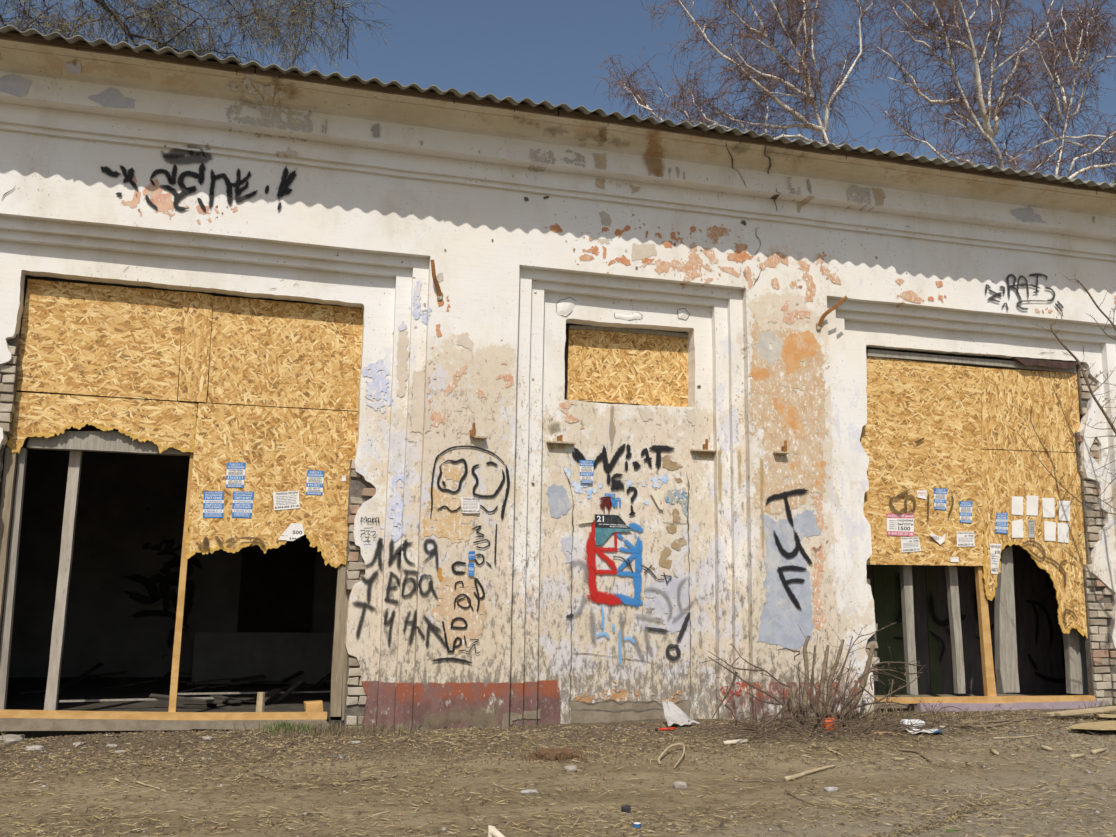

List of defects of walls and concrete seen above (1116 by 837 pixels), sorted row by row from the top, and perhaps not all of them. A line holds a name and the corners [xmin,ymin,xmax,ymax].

peeling [895,279,946,313]
spalling [0,334,20,483]
peeling [542,210,841,638]
spalling [1076,363,1098,415]
spalling [1074,432,1116,707]
spalling [344,653,367,730]